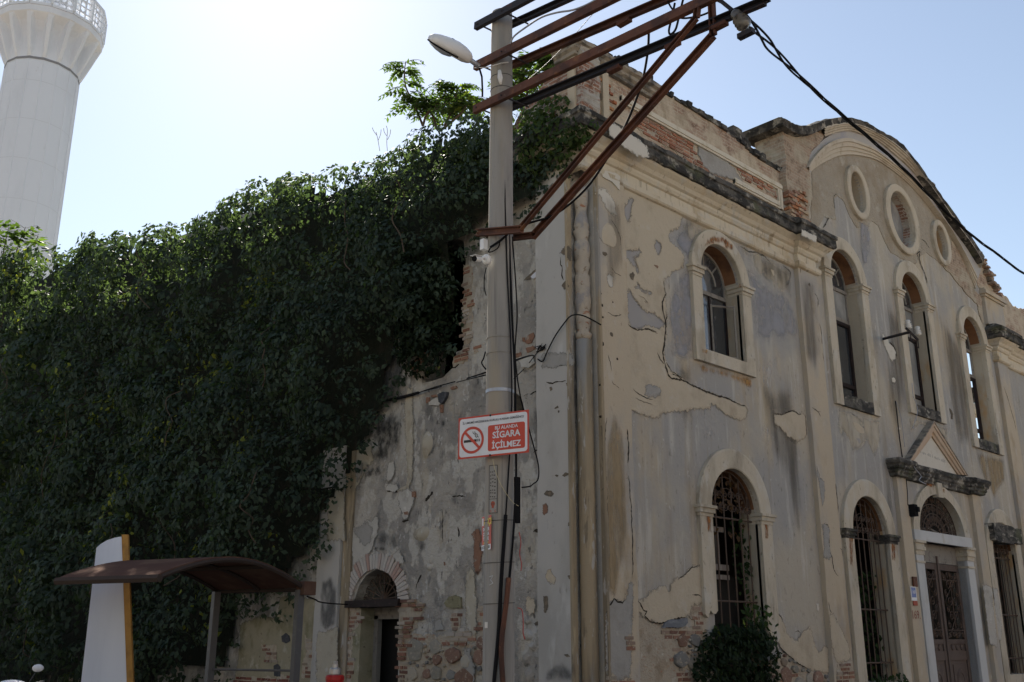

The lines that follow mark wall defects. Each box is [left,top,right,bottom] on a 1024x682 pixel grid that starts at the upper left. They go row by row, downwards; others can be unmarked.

flaking render [737,168,778,198]
peeling [595,170,748,421]
crack [608,287,748,412]
spalling [471,528,483,575]
spalling [605,564,704,682]